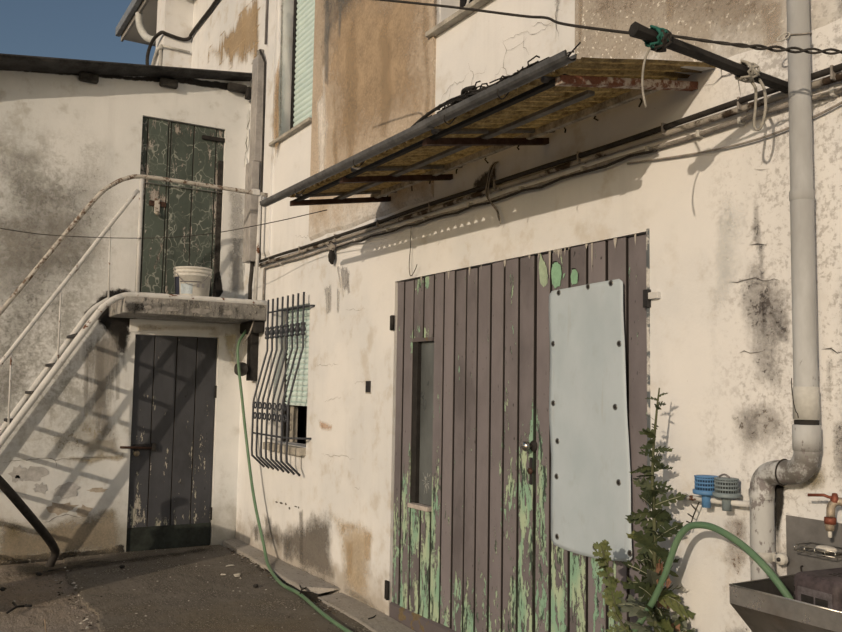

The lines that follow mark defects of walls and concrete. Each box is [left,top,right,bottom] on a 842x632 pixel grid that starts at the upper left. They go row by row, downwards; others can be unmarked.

damp [322,0,417,137]
crack [440,10,561,101]
damp [318,95,326,172]
damp [744,271,787,351]
damp [56,289,150,448]
peeling [8,465,108,517]
damp [255,518,330,581]
damp [286,584,321,602]
damp [334,528,374,608]